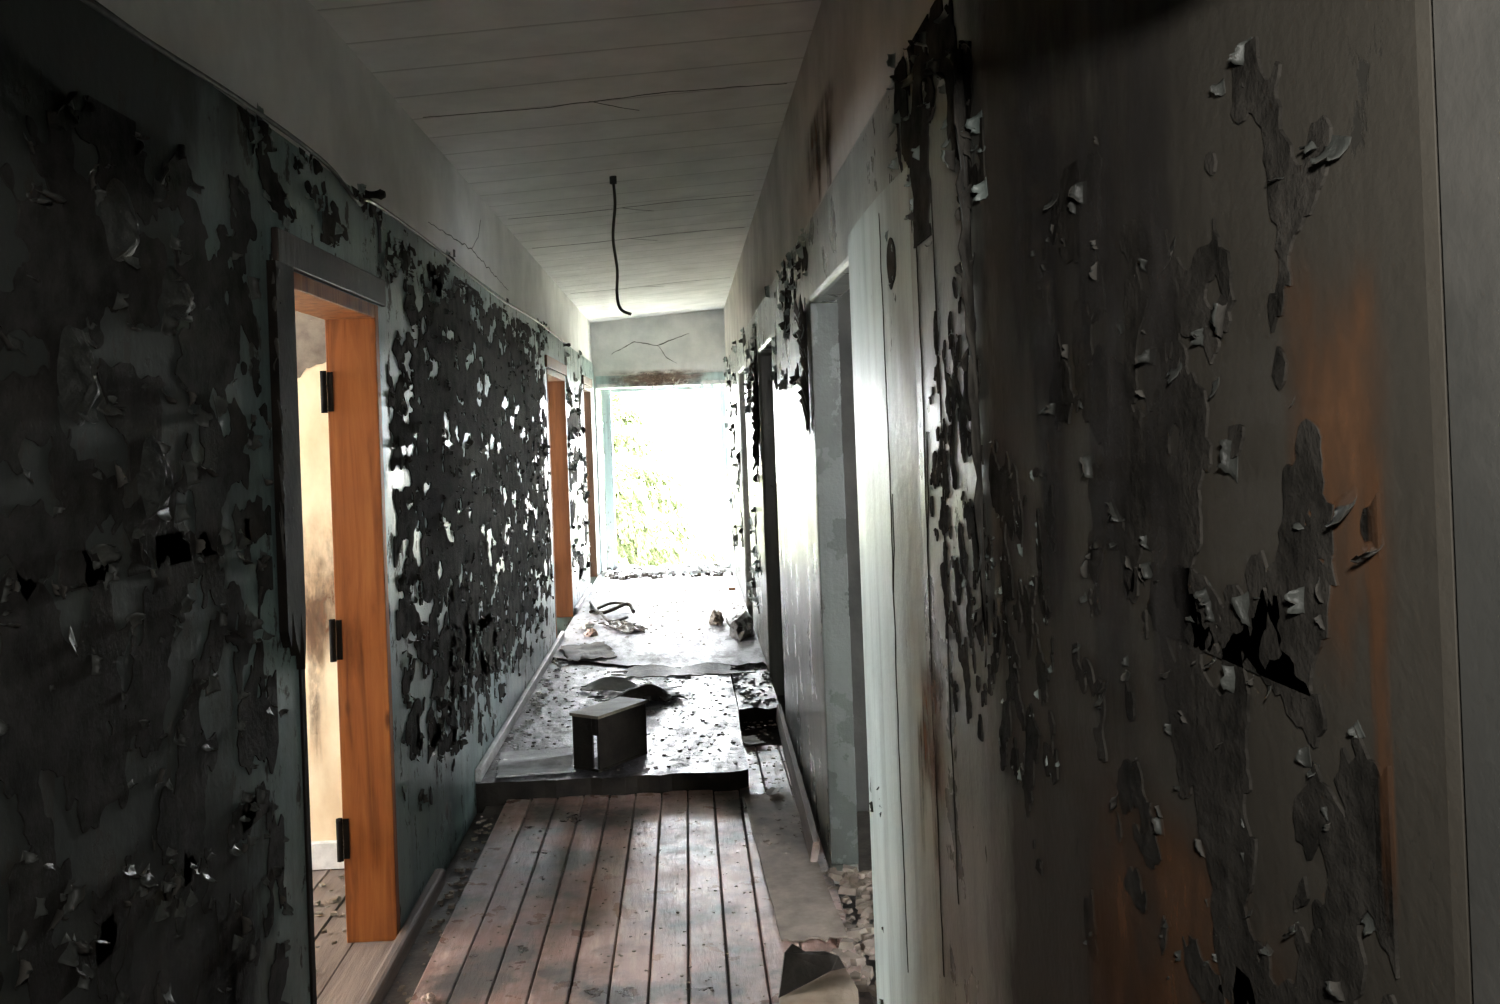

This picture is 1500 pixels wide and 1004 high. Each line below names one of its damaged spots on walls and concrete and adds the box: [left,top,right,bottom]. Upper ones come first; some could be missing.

peeling [351,184,621,772]
crack [611,334,686,363]
peeling [646,228,808,611]